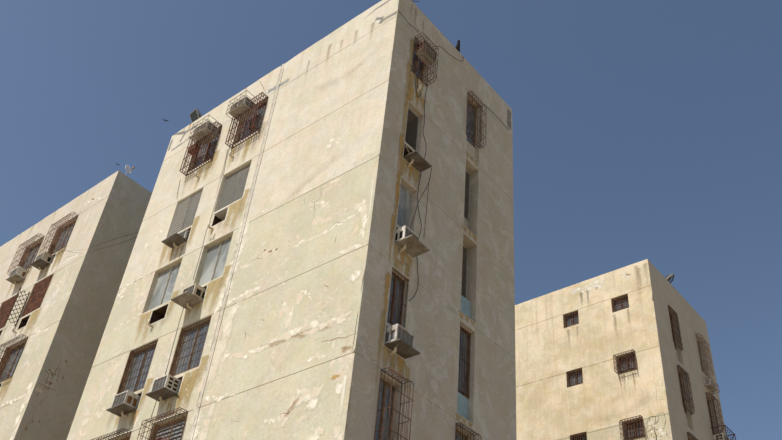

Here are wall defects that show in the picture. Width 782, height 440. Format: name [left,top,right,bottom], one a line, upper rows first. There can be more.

corrosion [391,41,426,270]
peeling [186,215,352,440]